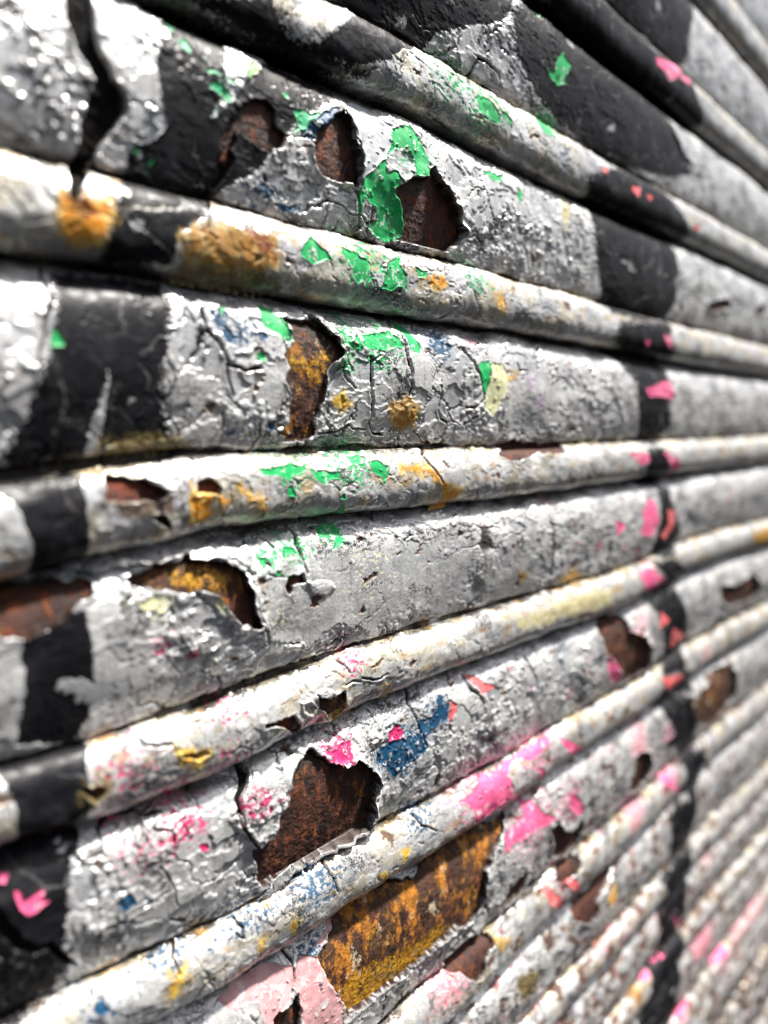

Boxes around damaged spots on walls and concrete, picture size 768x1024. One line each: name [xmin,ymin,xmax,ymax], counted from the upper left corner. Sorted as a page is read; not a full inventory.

peeling [283,92,430,242]
crack [188,312,260,394]
rust [279,315,356,439]
crack [308,321,340,347]
crack [319,338,412,435]
peeling [61,542,281,576]
rust [128,558,267,634]
crack [85,808,186,860]
peeling [244,765,288,849]
rust [252,753,384,881]
rust [318,809,512,1012]
peeling [217,917,344,1024]